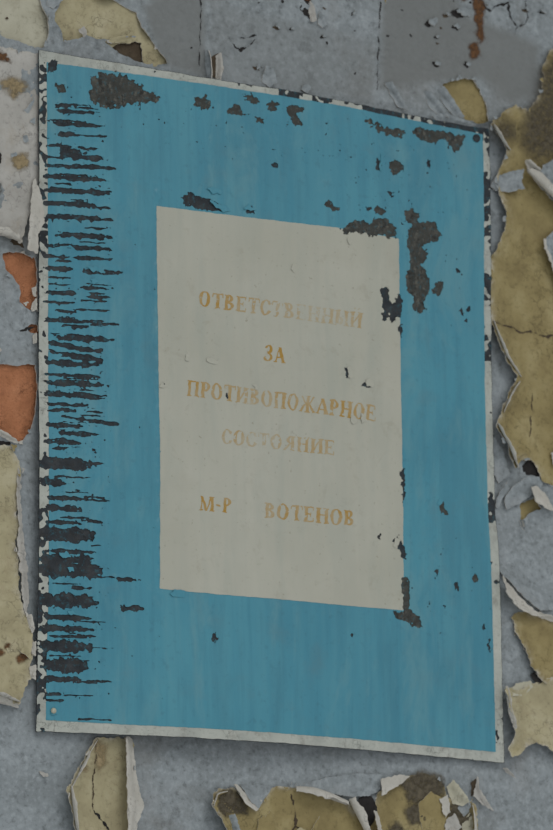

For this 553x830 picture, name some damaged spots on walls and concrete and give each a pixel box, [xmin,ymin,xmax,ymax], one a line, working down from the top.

spalling [300,0,328,45]
peeling [424,0,472,45]
peeling [0,0,167,312]
spalling [20,324,38,344]
peeling [423,49,553,531]
peeling [0,364,37,708]
peeling [499,562,553,757]
peeling [66,736,144,830]
peeling [211,773,494,830]